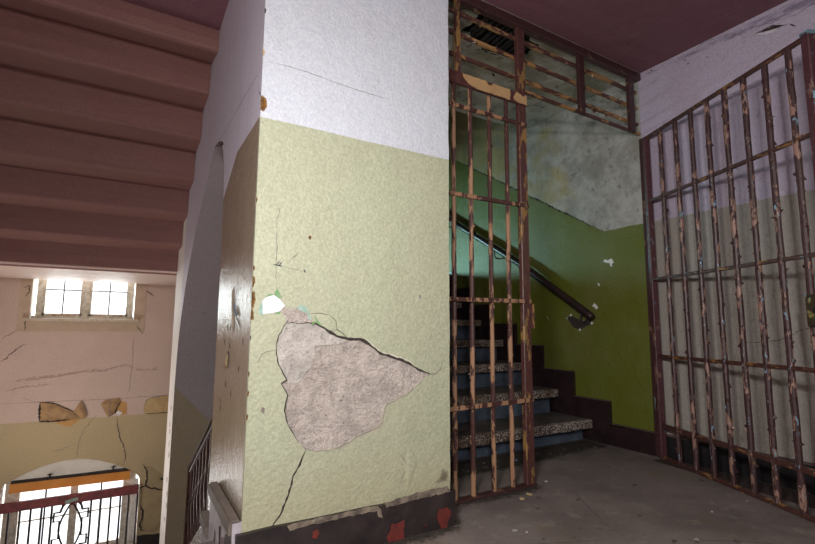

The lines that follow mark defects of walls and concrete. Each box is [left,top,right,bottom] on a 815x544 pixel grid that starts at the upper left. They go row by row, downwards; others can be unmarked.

spalling [460,14,514,55]
spalling [258,289,442,452]
peeling [38,401,86,427]
peeling [101,398,127,417]
peeling [144,395,169,414]
crack [117,419,163,531]
crack [272,450,306,526]
peeling [287,486,451,542]